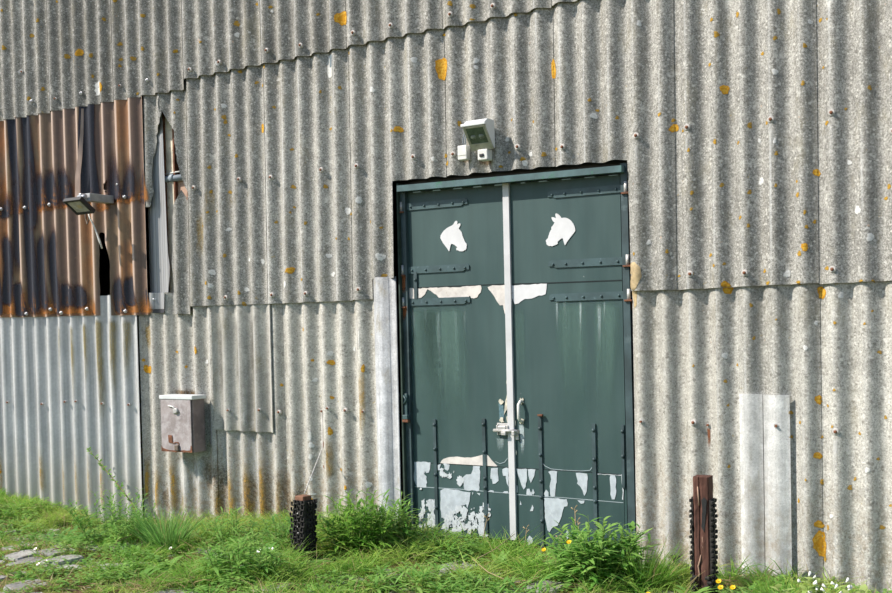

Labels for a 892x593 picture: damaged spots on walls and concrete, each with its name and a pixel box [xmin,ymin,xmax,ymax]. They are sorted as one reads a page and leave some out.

peeling [409,284,547,313]
leakage [145,439,316,518]
peeling [414,455,588,537]
peeling [602,474,624,500]